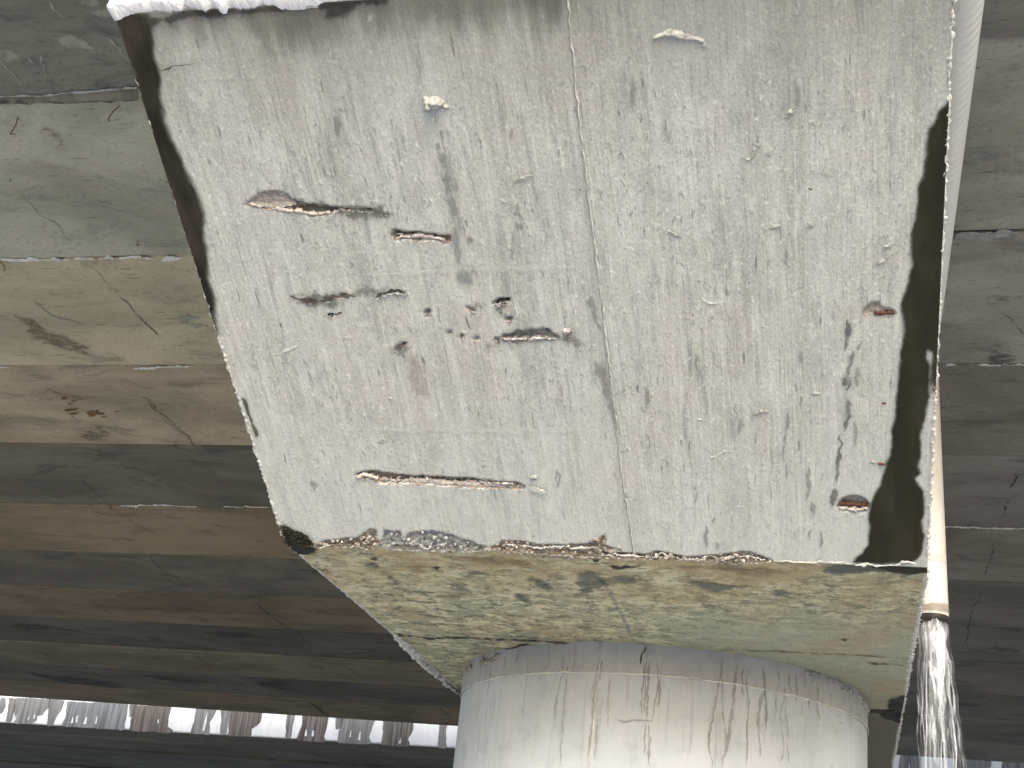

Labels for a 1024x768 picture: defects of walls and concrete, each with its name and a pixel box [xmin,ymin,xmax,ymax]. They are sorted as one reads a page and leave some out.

spalling [243,189,389,219]
spalling [391,230,452,244]
spalling [447,297,580,347]
leakage [774,103,1021,575]
spalling [356,470,547,495]
spalling [314,529,773,565]